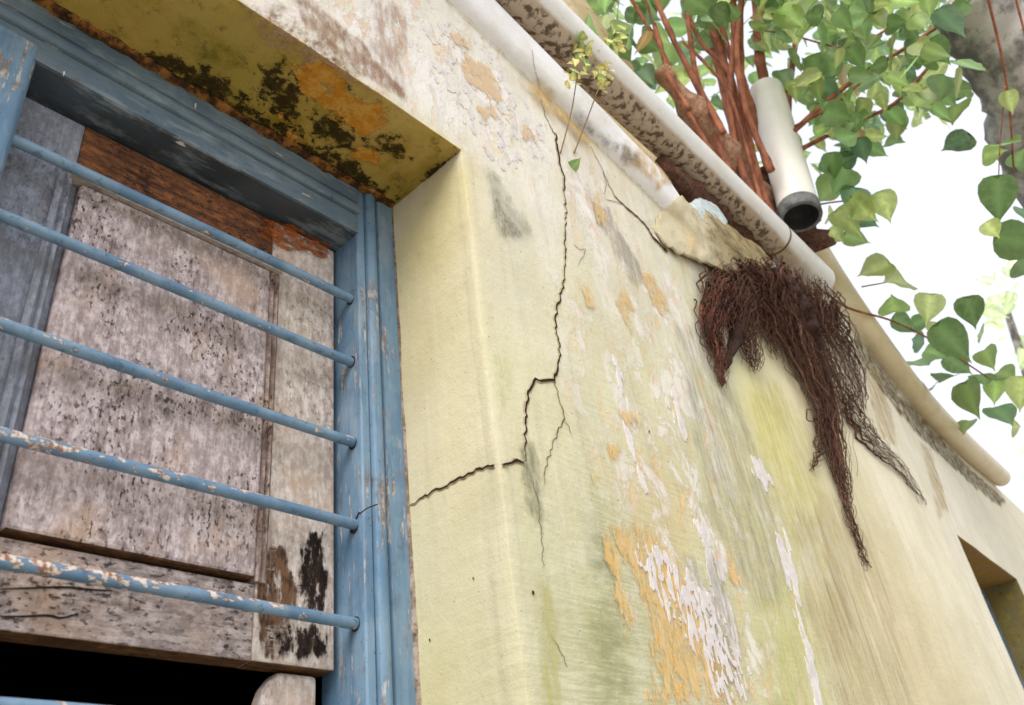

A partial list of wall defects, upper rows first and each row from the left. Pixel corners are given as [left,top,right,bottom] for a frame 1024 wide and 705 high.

water stain [139,0,414,201]
water stain [421,153,458,182]
peeling [422,18,547,171]
crack [590,146,668,253]
crack [392,52,586,705]
peeling [608,354,649,494]
peeling [665,388,688,441]
peeling [750,455,774,492]
water stain [255,530,331,611]
water stain [259,613,328,660]
peeling [603,518,752,705]
peeling [775,527,823,705]